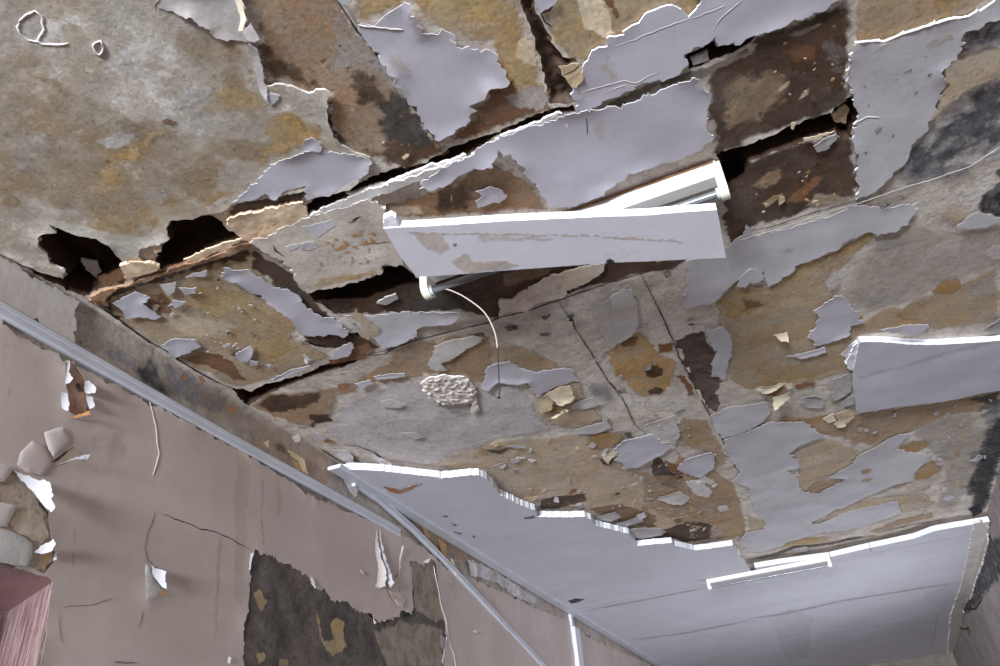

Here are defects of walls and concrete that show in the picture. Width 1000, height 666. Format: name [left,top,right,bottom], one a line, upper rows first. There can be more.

peeling [155,0,280,106]
crack [337,1,395,78]
peeling [233,0,583,213]
crack [576,72,658,133]
spalling [686,36,755,69]
spalling [716,96,858,191]
spalling [17,215,465,406]
crack [359,262,738,472]
crack [322,440,392,465]
peeling [481,326,956,552]
crack [163,514,253,552]
spalling [242,549,446,666]